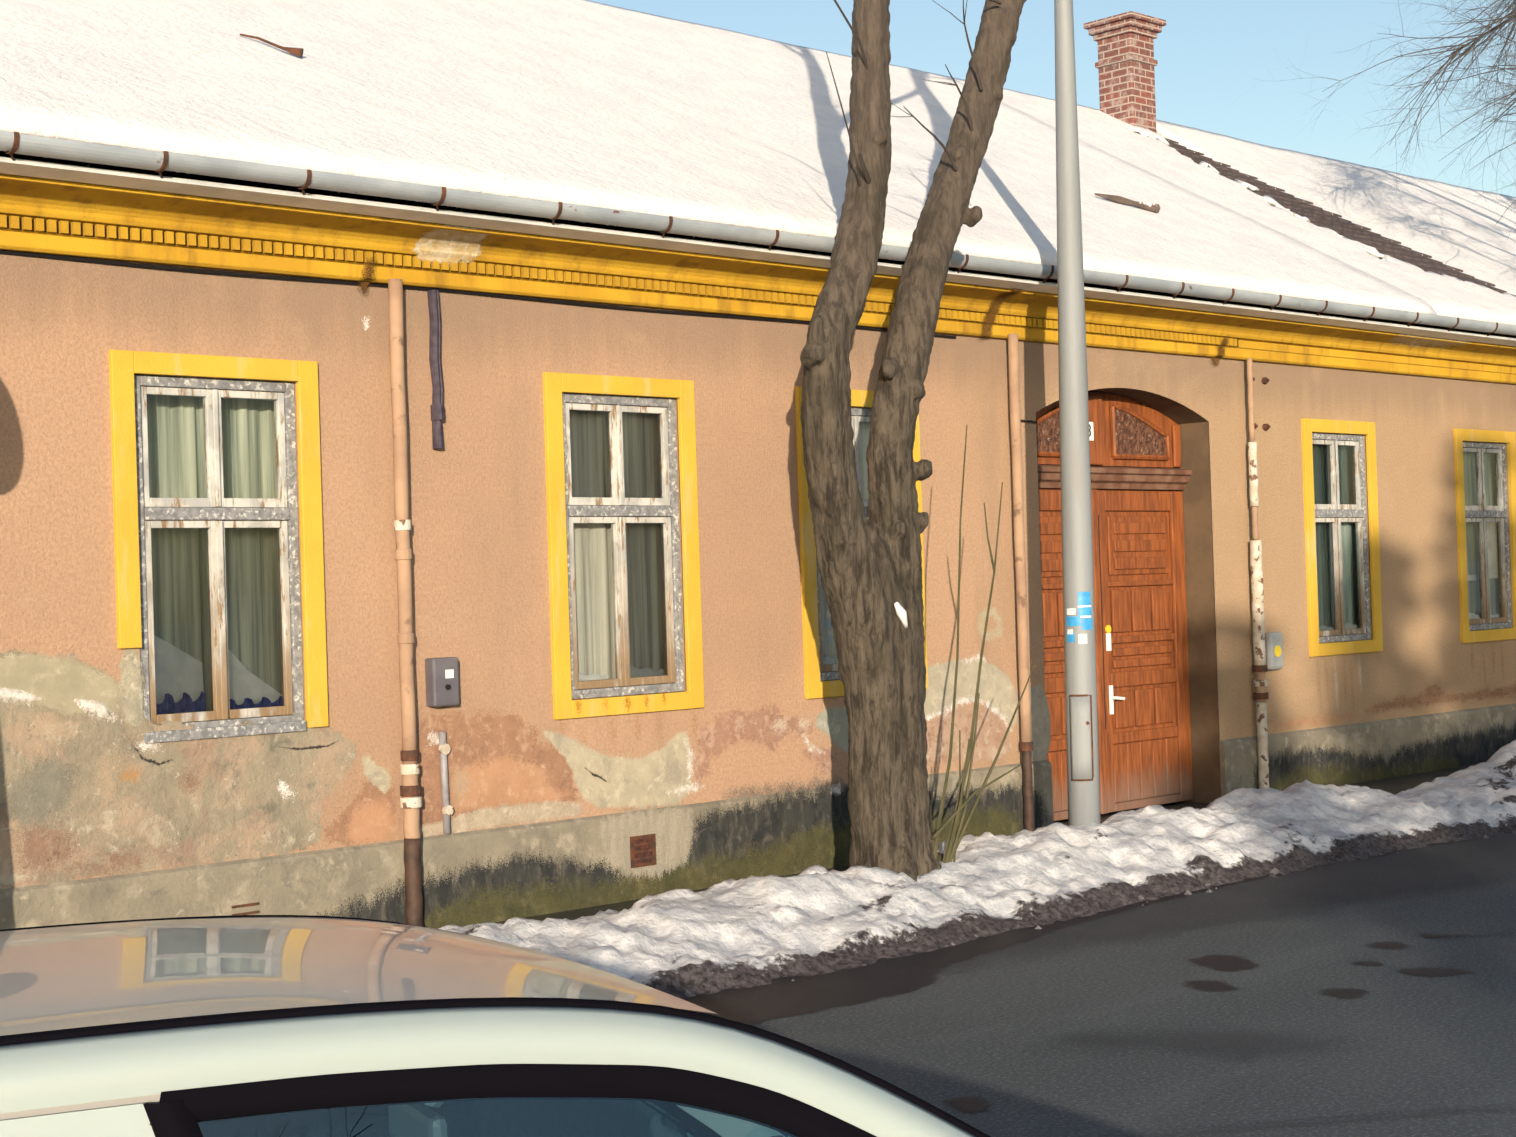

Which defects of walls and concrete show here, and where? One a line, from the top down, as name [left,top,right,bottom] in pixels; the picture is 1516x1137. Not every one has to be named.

flaking render [0,648,400,890]
flaking render [416,706,586,837]
water stain [314,774,851,929]
flaking render [667,703,844,798]
flaking render [924,654,1019,772]
water stain [928,779,1052,844]
water stain [1253,719,1516,791]